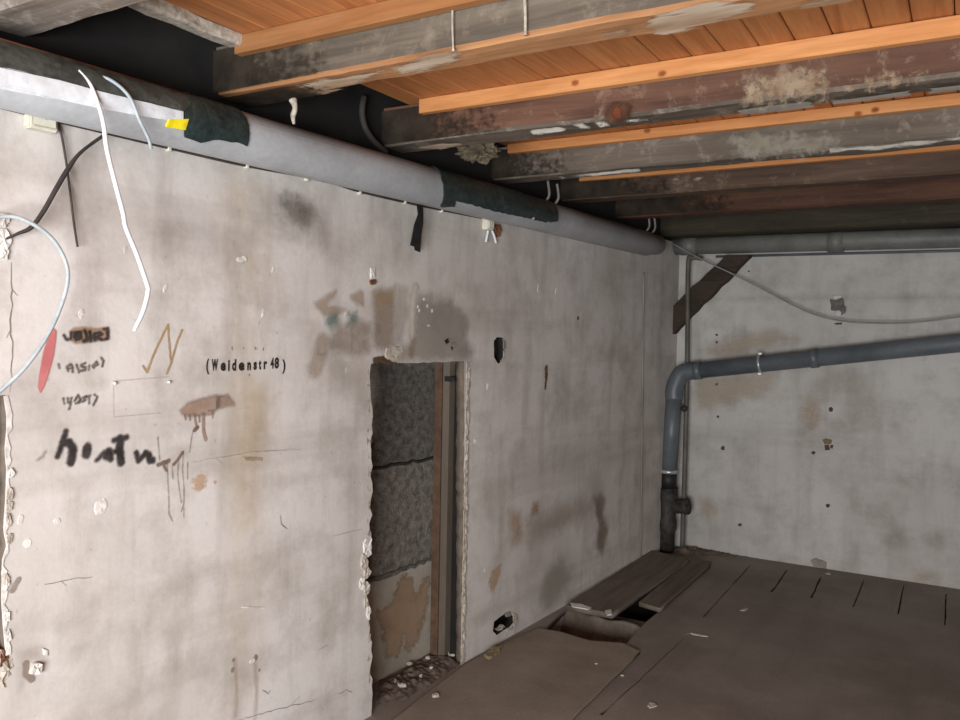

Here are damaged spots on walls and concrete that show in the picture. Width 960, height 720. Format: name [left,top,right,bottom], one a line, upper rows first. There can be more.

spalling [0,396,48,688]
peeling [359,428,430,658]